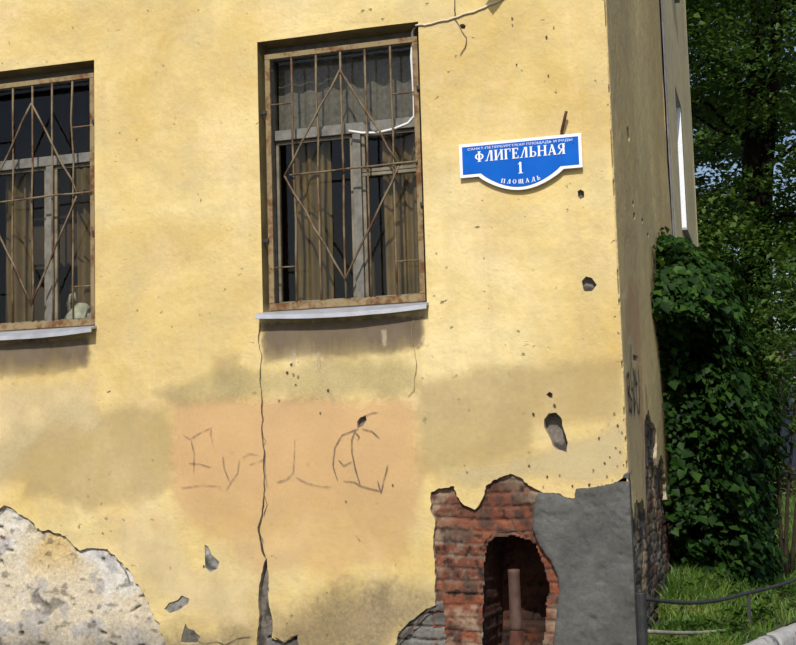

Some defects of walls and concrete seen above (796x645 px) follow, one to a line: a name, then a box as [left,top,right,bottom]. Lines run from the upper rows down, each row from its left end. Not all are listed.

spalling [582,276,597,291]
leakage [0,338,88,369]
spalling [544,392,568,453]
crack [195,323,297,645]
spalling [632,410,678,639]
spalling [203,545,219,572]
spalling [397,474,559,645]
spalling [0,507,165,645]
spalling [165,595,189,613]
spalling [181,624,201,643]
spalling [266,633,298,645]